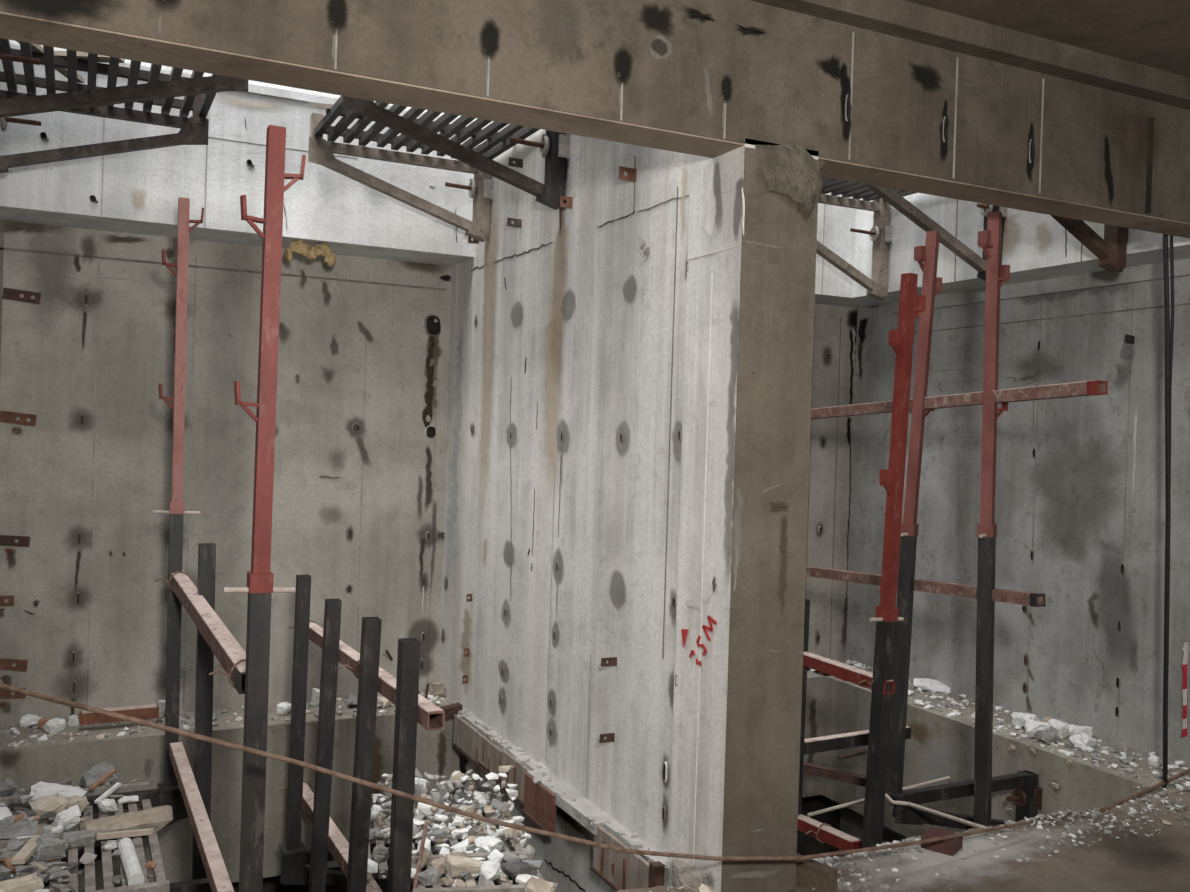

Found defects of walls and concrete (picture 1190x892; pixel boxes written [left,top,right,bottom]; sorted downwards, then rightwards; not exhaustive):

water stain [819,57,851,139]
crack [598,156,688,227]
crack [470,242,552,289]